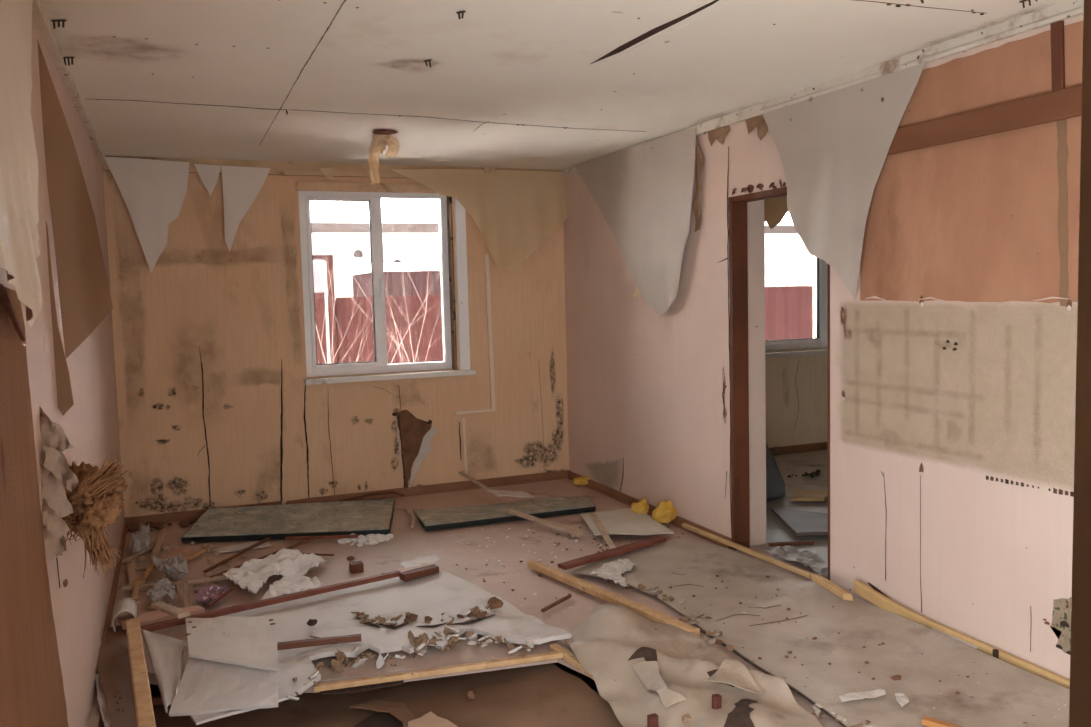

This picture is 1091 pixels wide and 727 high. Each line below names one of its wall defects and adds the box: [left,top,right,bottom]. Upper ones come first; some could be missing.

crack [94,0,646,146]
crack [591,0,729,67]
crack [856,0,987,15]
crack [197,346,211,507]
mould [514,352,564,472]
damp [126,460,216,515]
crack [880,472,888,581]
crack [917,475,925,613]